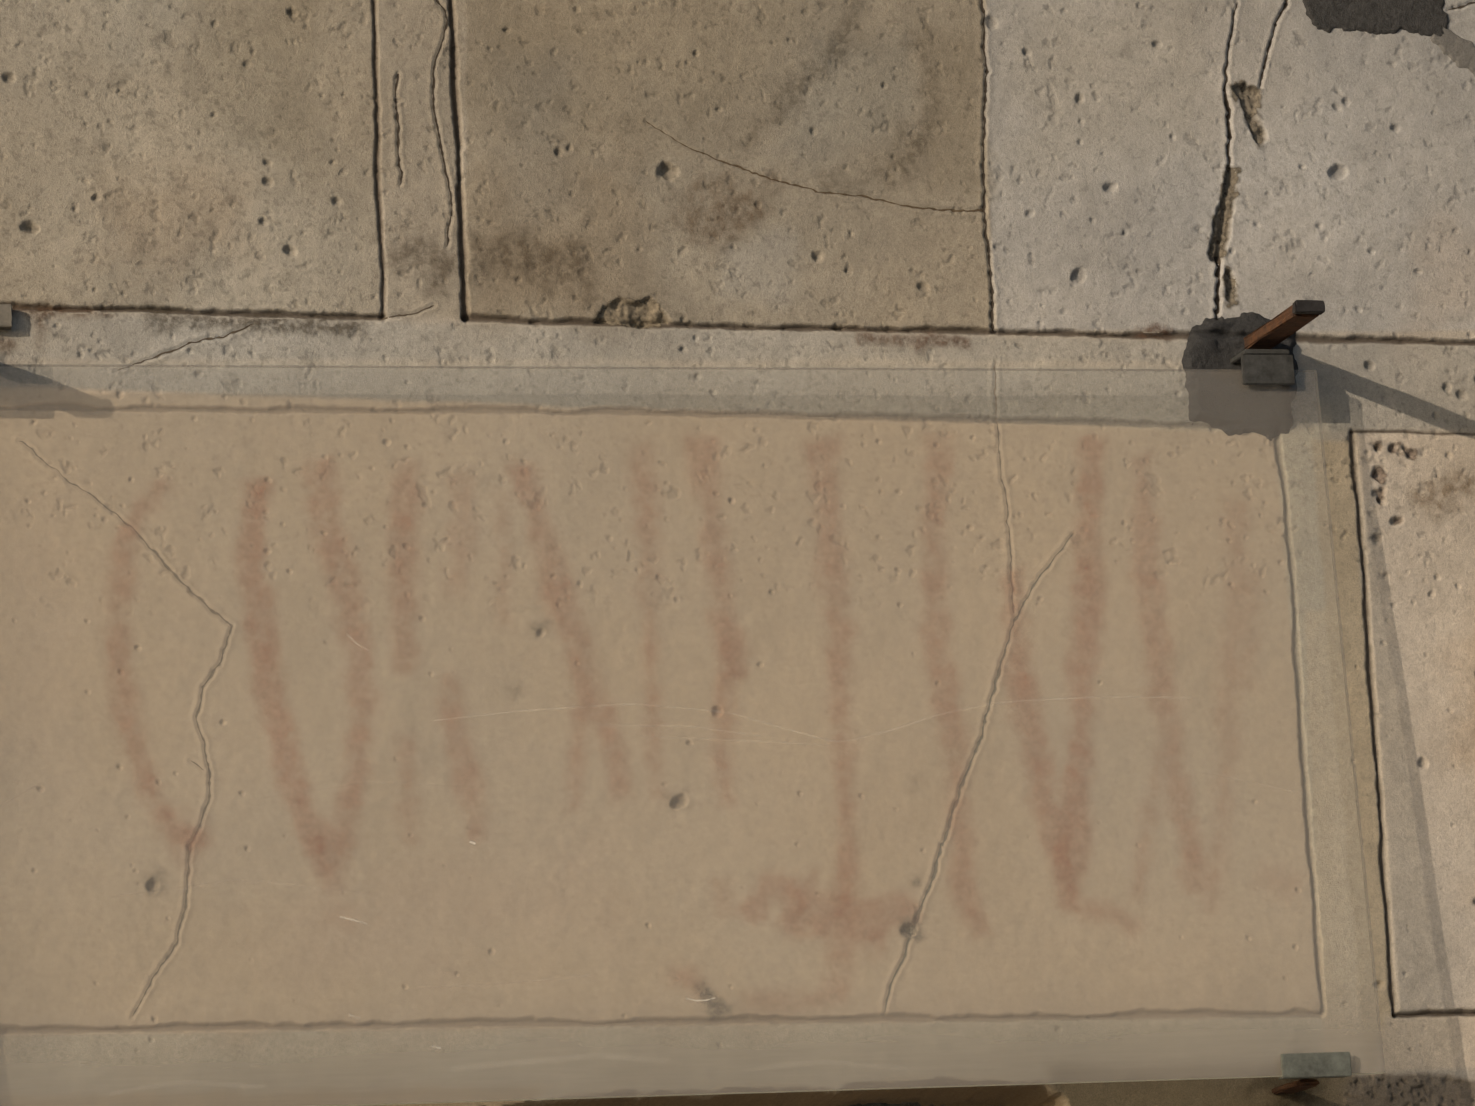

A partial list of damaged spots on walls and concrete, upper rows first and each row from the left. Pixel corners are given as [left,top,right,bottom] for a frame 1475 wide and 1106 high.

crack [1214,0,1288,319]
crack [1430,2,1475,77]
crack [19,441,233,1017]
crack [646,0,1074,1012]